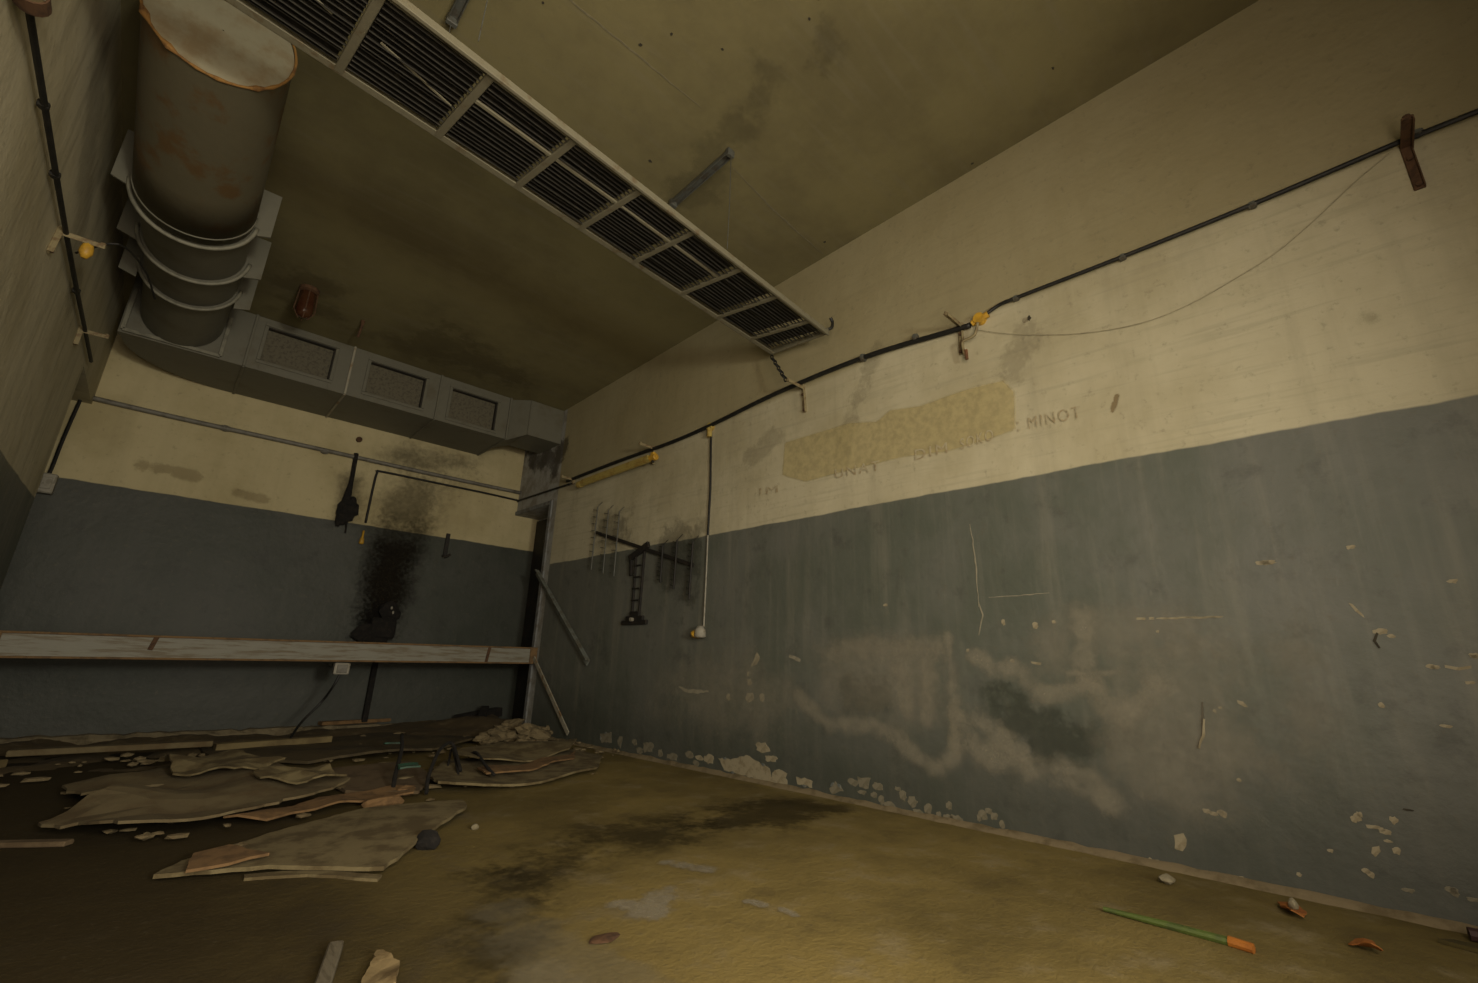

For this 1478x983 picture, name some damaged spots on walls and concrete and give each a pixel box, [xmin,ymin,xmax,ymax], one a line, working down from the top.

peeling [600,732,1005,829]
peeling [1174,833,1187,851]
peeling [1350,808,1414,878]